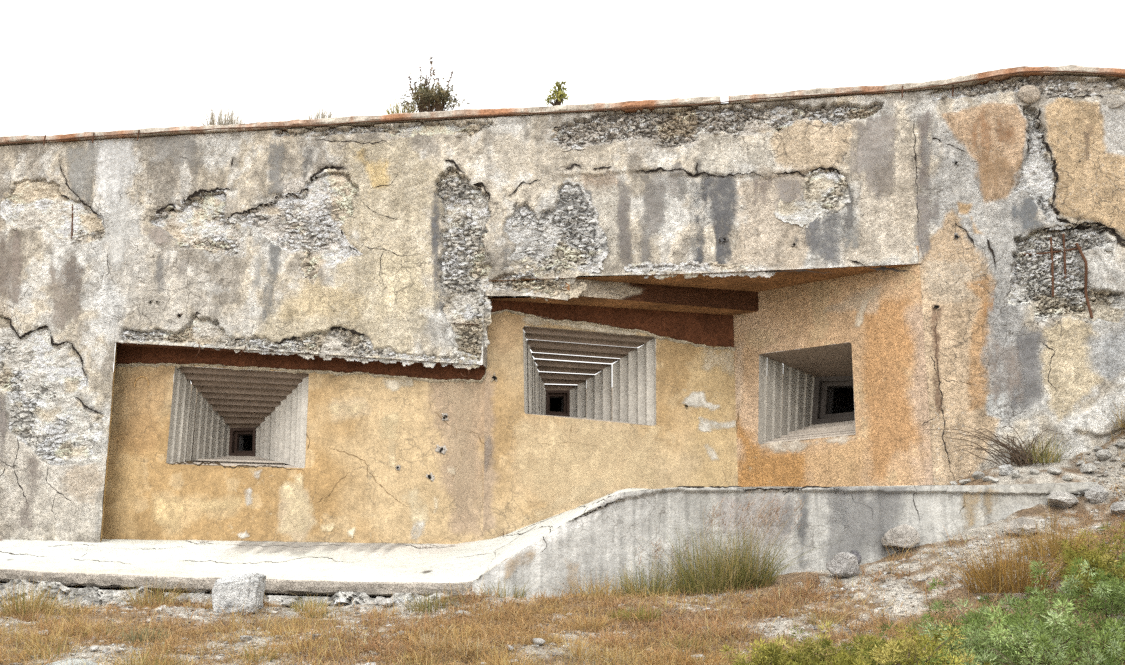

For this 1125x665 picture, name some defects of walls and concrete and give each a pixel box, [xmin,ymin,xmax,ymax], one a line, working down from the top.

crack [58,158,106,227]
damp [617,163,683,264]
damp [691,160,737,264]
spalling [550,102,882,150]
spalling [774,169,851,228]
spalling [1007,108,1125,323]
crack [1017,94,1125,246]
spalling [116,167,609,369]
spalling [0,316,105,465]
crack [0,316,107,418]
crack [0,439,404,565]
crack [172,433,310,470]